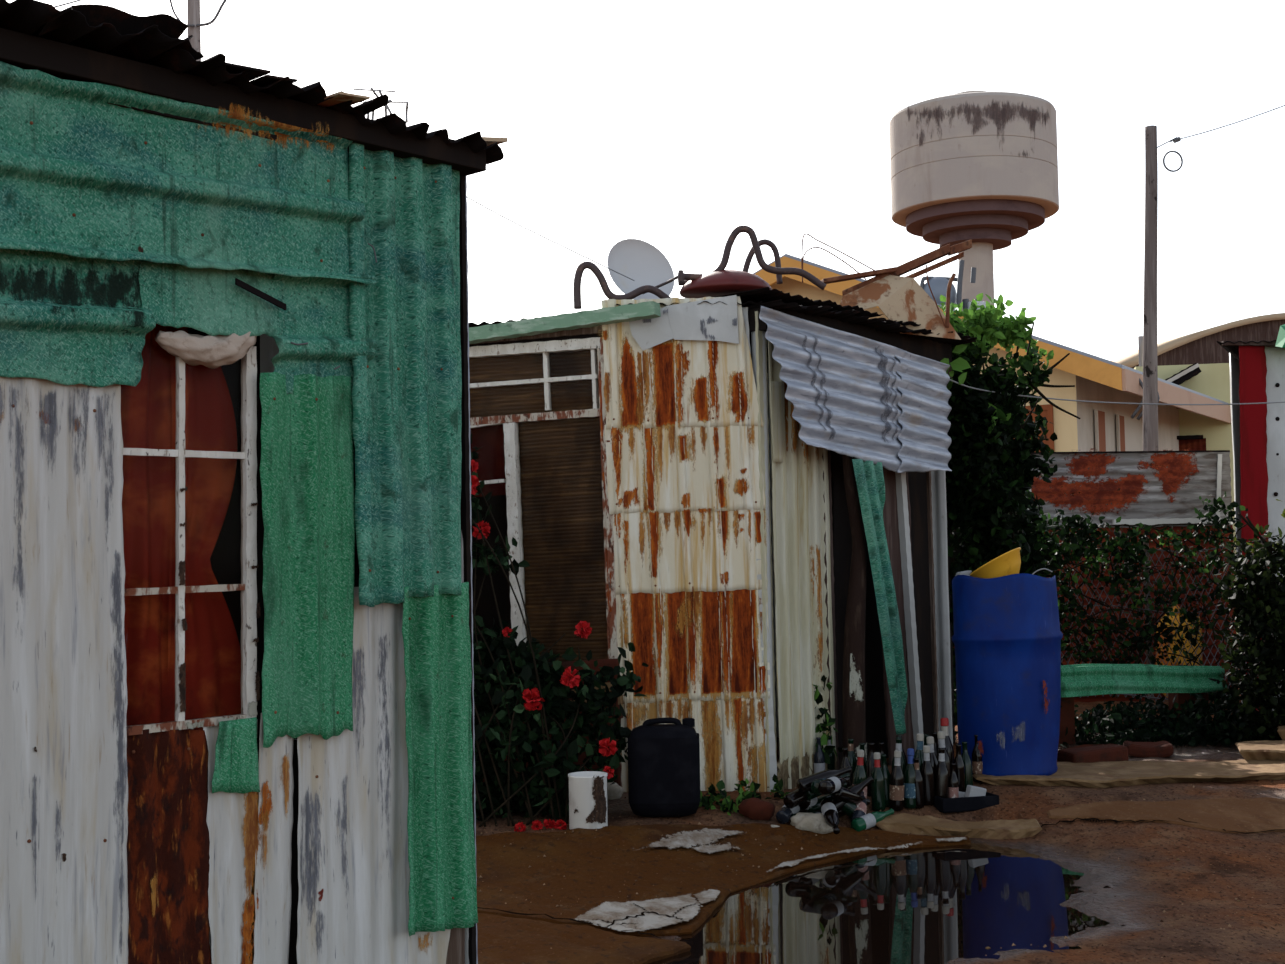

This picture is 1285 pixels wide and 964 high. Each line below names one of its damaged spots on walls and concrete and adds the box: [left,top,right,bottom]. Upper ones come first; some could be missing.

water stain [907,102,1049,146]
rust [1031,448,1200,515]
rust [601,327,768,792]
rust [241,755,290,964]
rust [150,876,159,917]